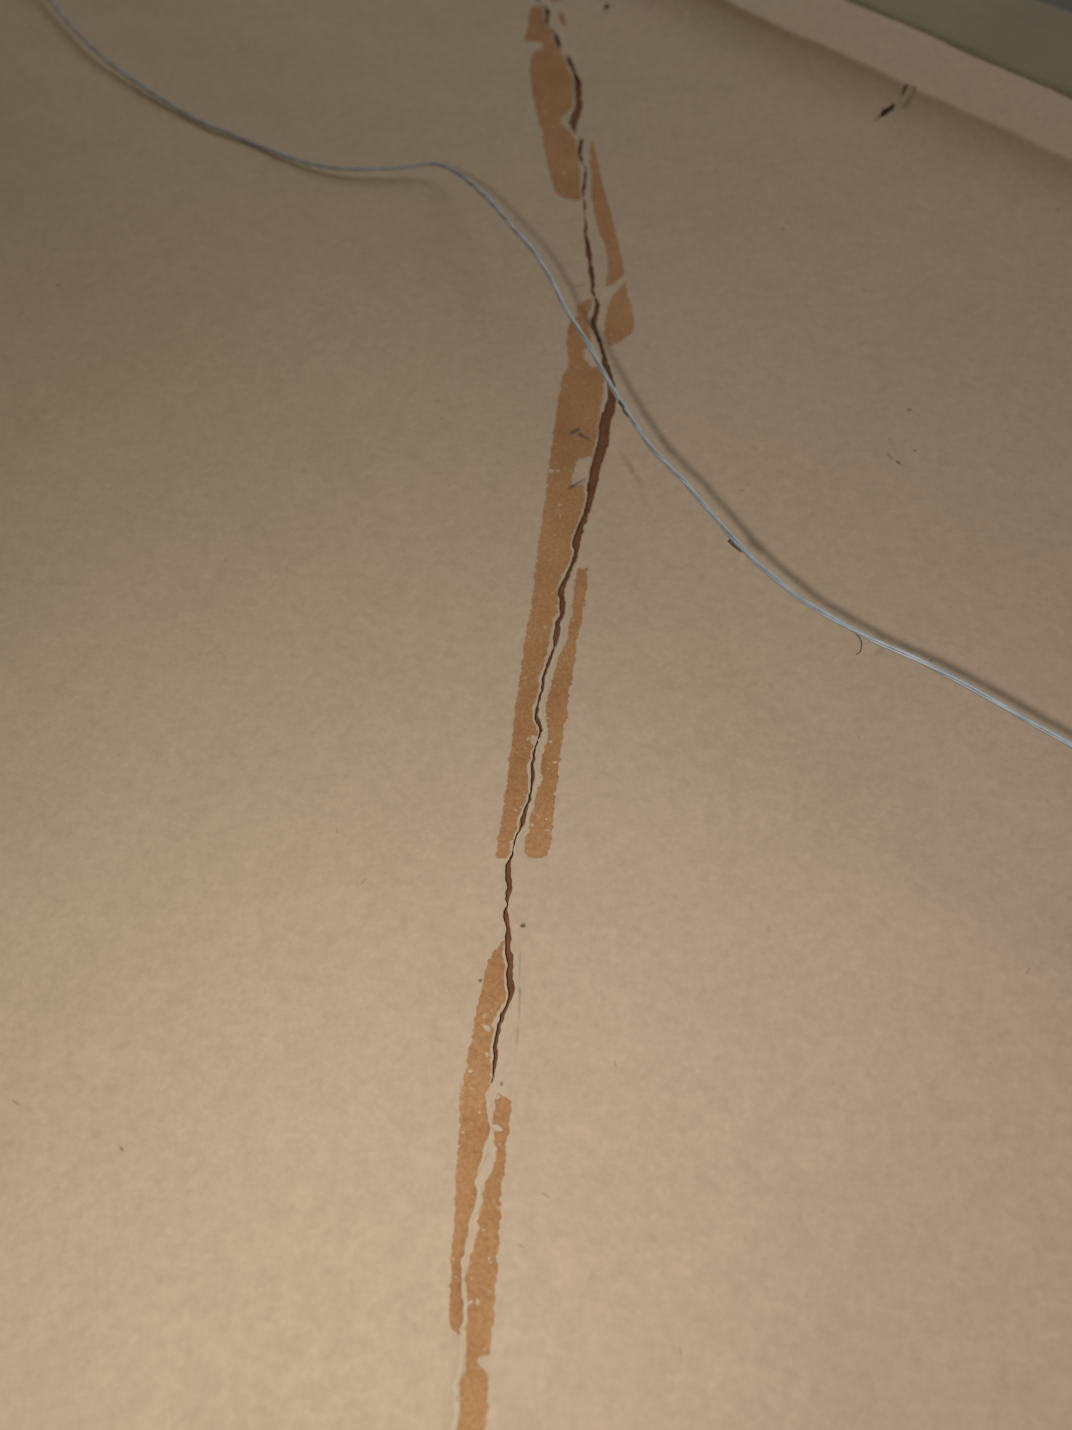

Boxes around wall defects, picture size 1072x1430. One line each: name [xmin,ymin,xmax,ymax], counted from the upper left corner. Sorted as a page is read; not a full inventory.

crack [449,0,616,1430]
peeling [496,0,635,858]
peeling [449,941,511,1430]